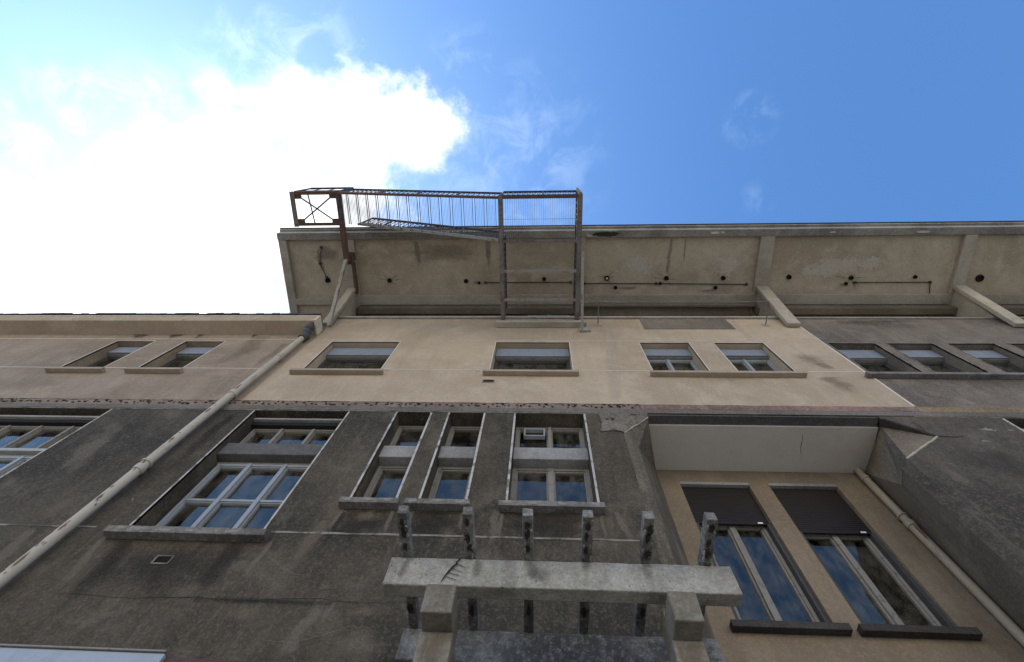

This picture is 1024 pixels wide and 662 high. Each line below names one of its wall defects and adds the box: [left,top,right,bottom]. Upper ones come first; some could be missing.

crack [441,557,464,582]